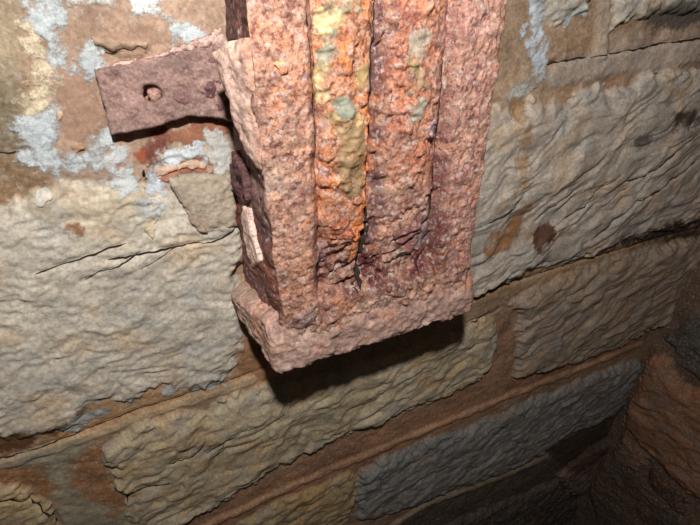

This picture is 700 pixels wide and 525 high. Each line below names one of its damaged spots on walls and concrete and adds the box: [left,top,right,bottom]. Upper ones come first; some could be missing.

leakage [8,0,234,224]
rust [94,28,228,73]
rust [174,76,230,111]
crack [367,0,375,143]
leakage [506,0,588,105]
spalling [154,155,214,182]
crack [36,227,235,280]
leakage [533,222,556,254]
rust [234,335,268,380]